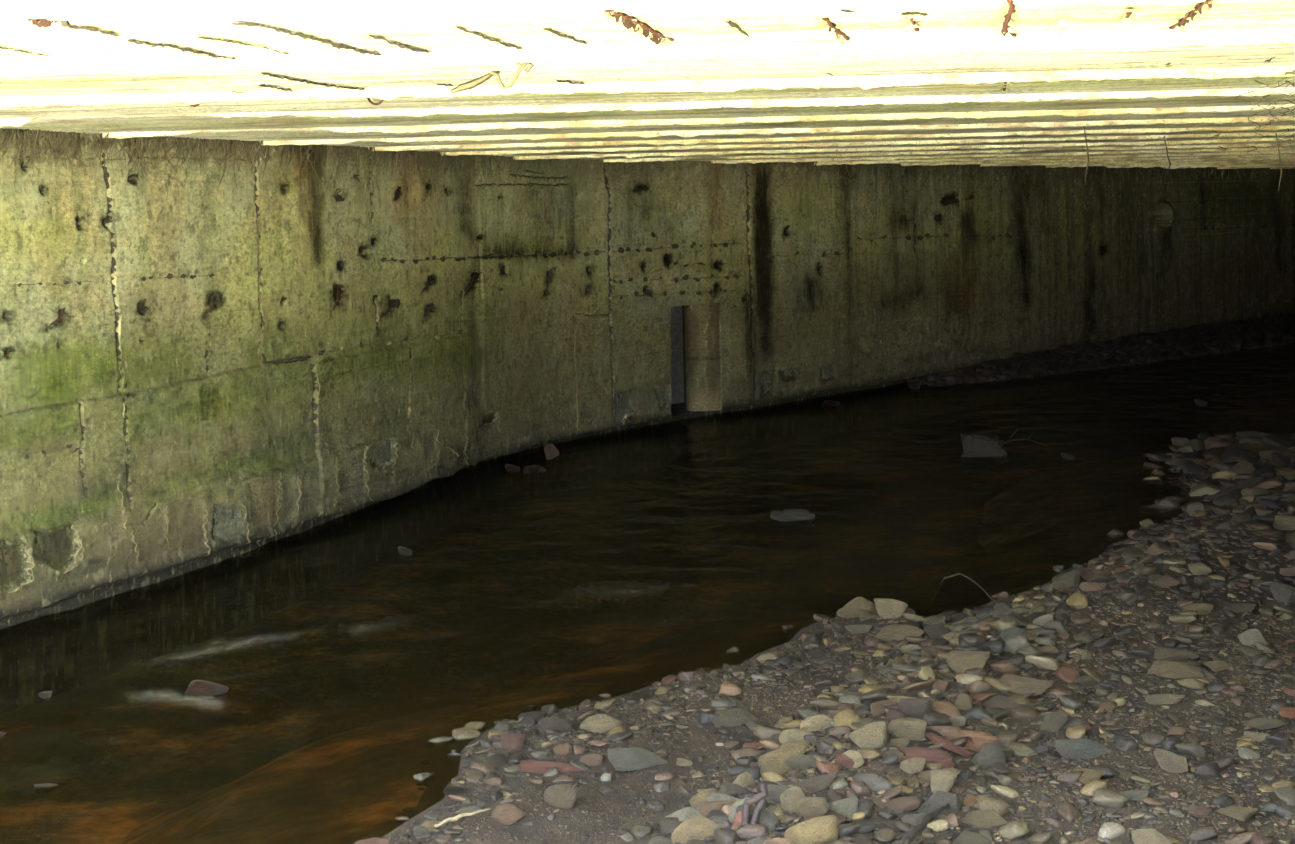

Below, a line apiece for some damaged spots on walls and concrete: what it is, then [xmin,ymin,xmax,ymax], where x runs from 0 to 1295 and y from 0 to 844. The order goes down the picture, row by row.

leakage [0,31,1295,77]
crack [0,143,1014,523]
leakage [0,66,1295,371]
spalling [0,525,84,593]